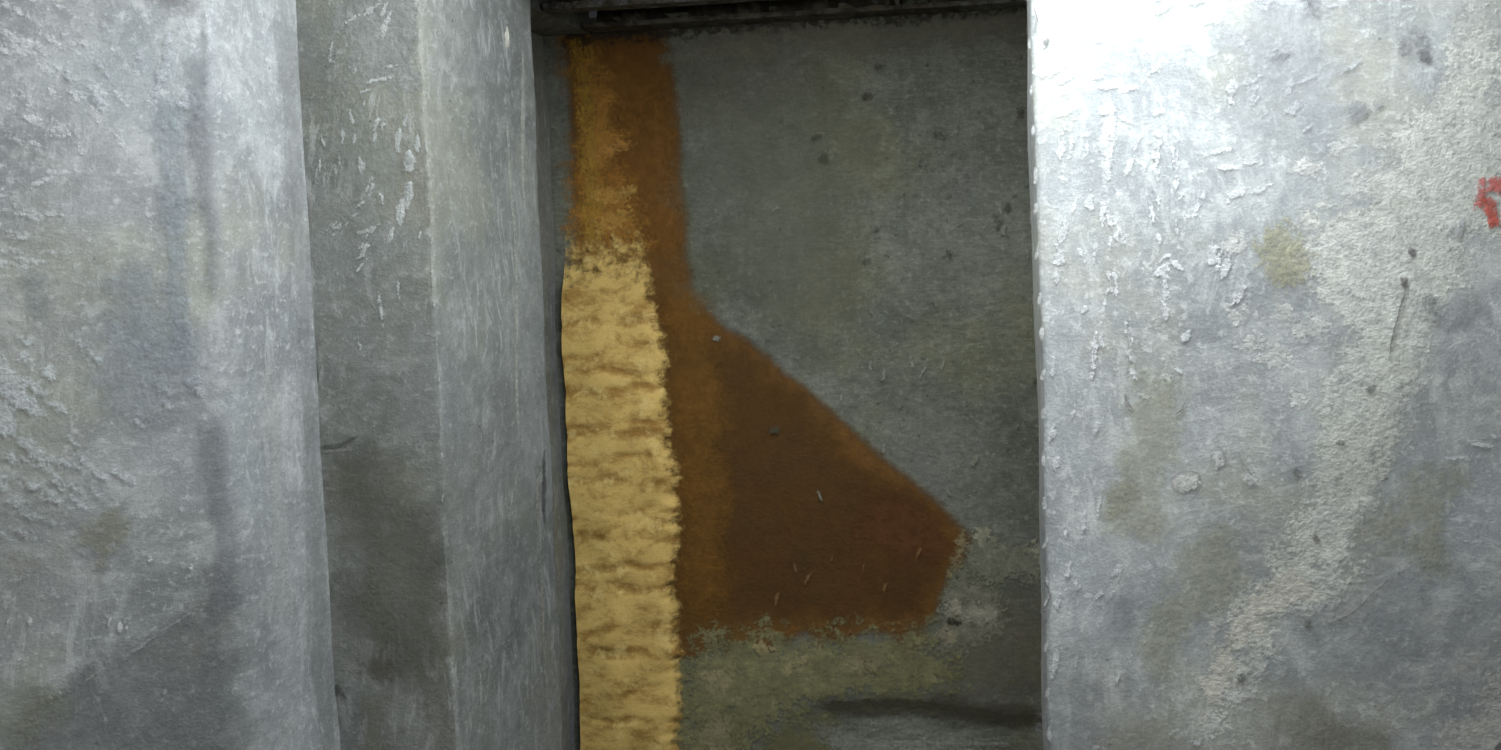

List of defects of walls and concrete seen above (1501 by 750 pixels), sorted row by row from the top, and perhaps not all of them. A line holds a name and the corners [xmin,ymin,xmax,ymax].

corrosion [565,29,971,658]